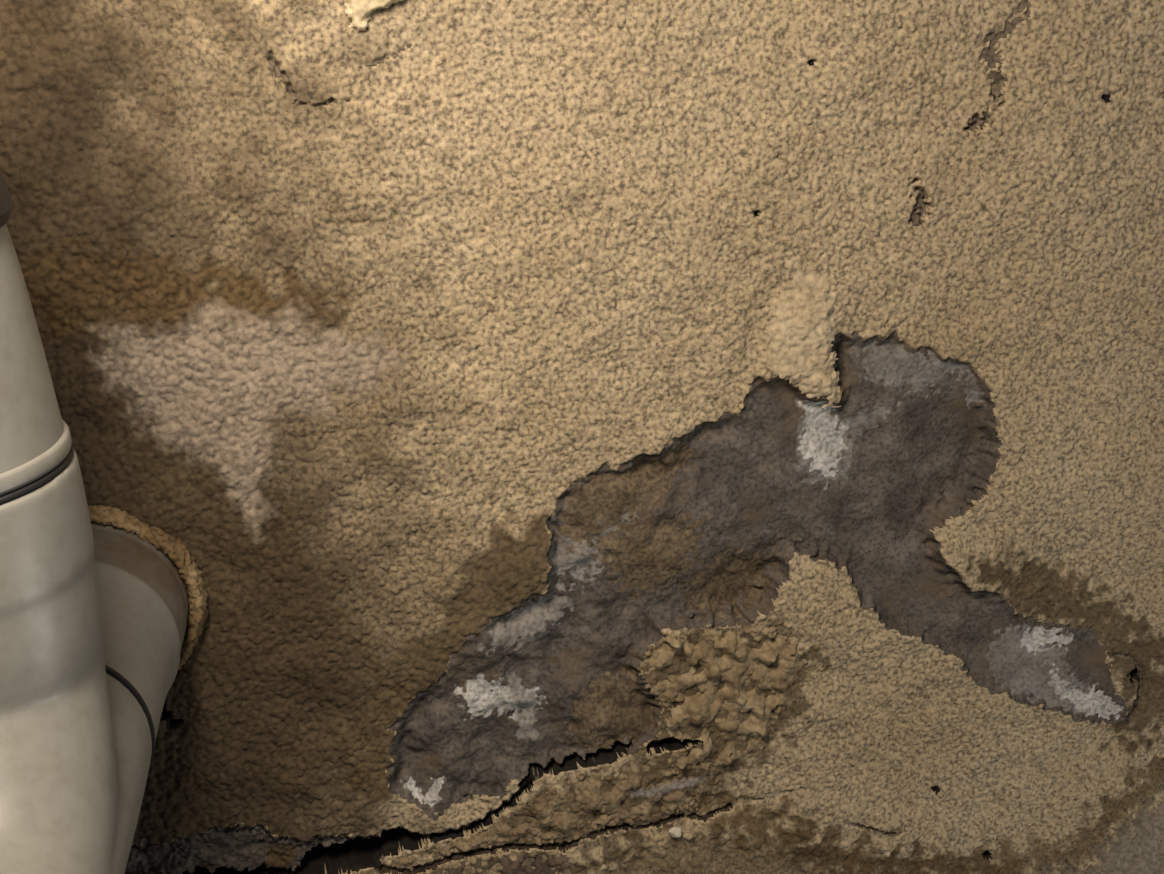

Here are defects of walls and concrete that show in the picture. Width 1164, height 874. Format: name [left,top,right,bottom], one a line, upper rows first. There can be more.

flaking render [344,0,404,33]
crack [182,737,733,874]
water stain [507,644,829,855]
water stain [687,621,789,658]
spalling [386,331,1143,874]
water stain [967,544,1164,753]